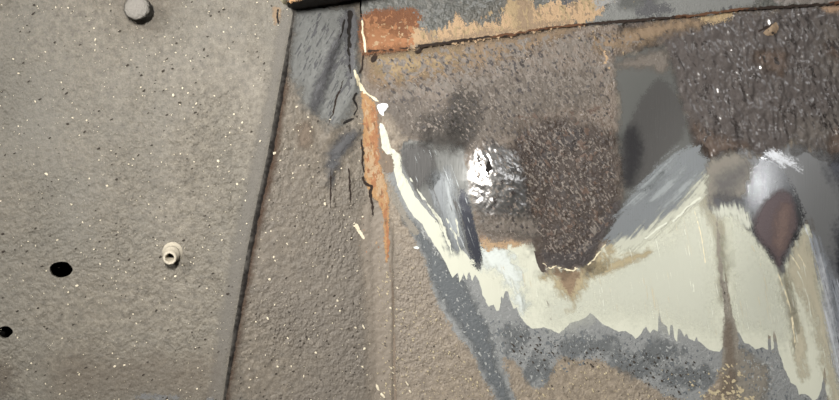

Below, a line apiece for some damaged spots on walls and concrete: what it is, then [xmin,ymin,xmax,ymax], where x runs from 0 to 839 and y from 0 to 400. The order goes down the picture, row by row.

leakage [310,6,360,112]
leakage [326,131,358,185]
corrosion [357,0,740,400]